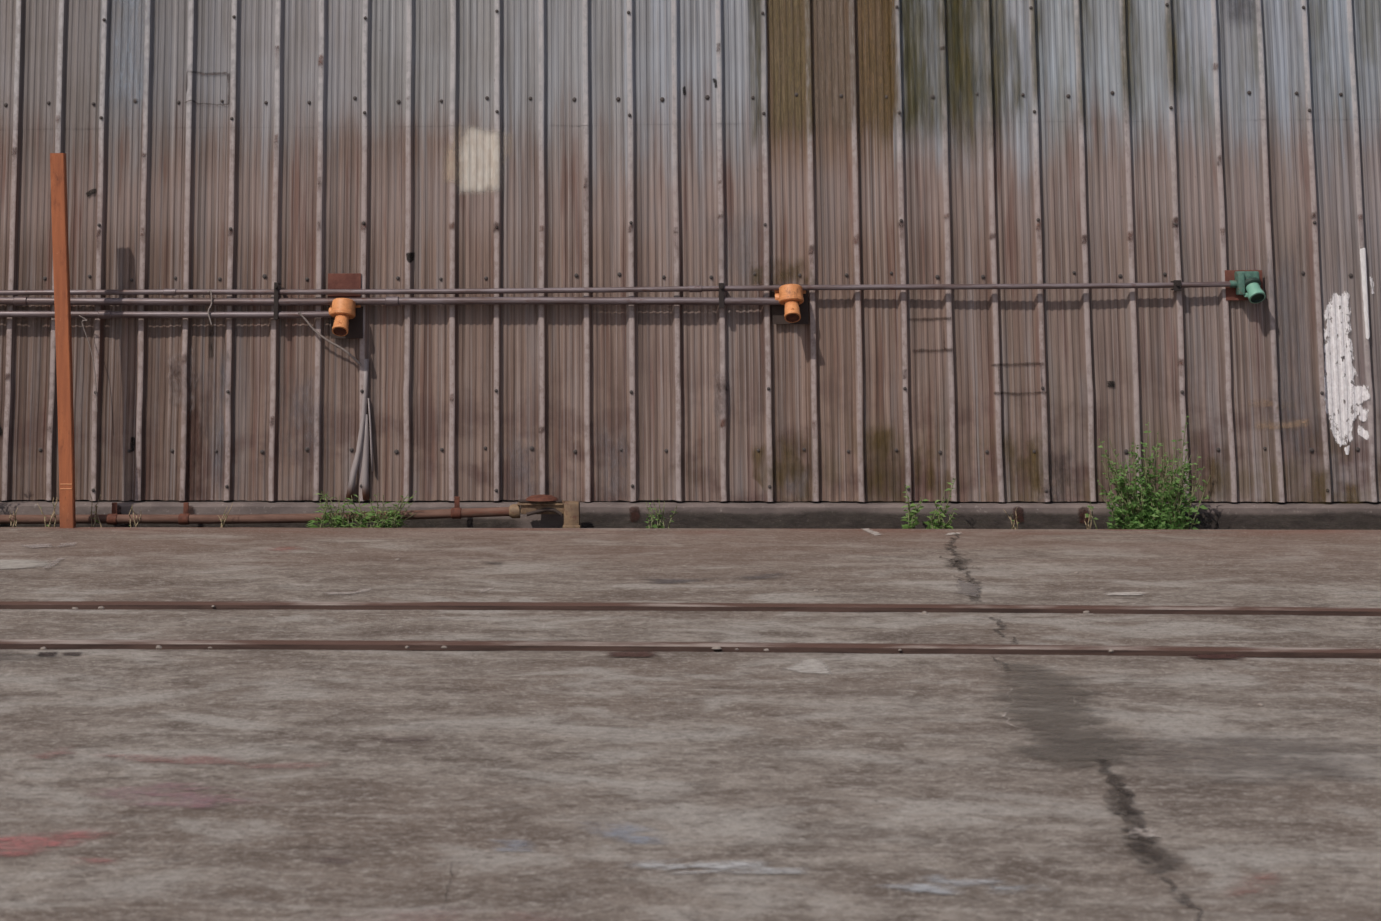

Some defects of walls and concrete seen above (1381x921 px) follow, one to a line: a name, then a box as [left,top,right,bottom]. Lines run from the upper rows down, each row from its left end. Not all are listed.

damp [752,0,910,132]
peeling [1324,376,1370,455]
crack [939,533,1019,671]
crack [1097,759,1202,921]